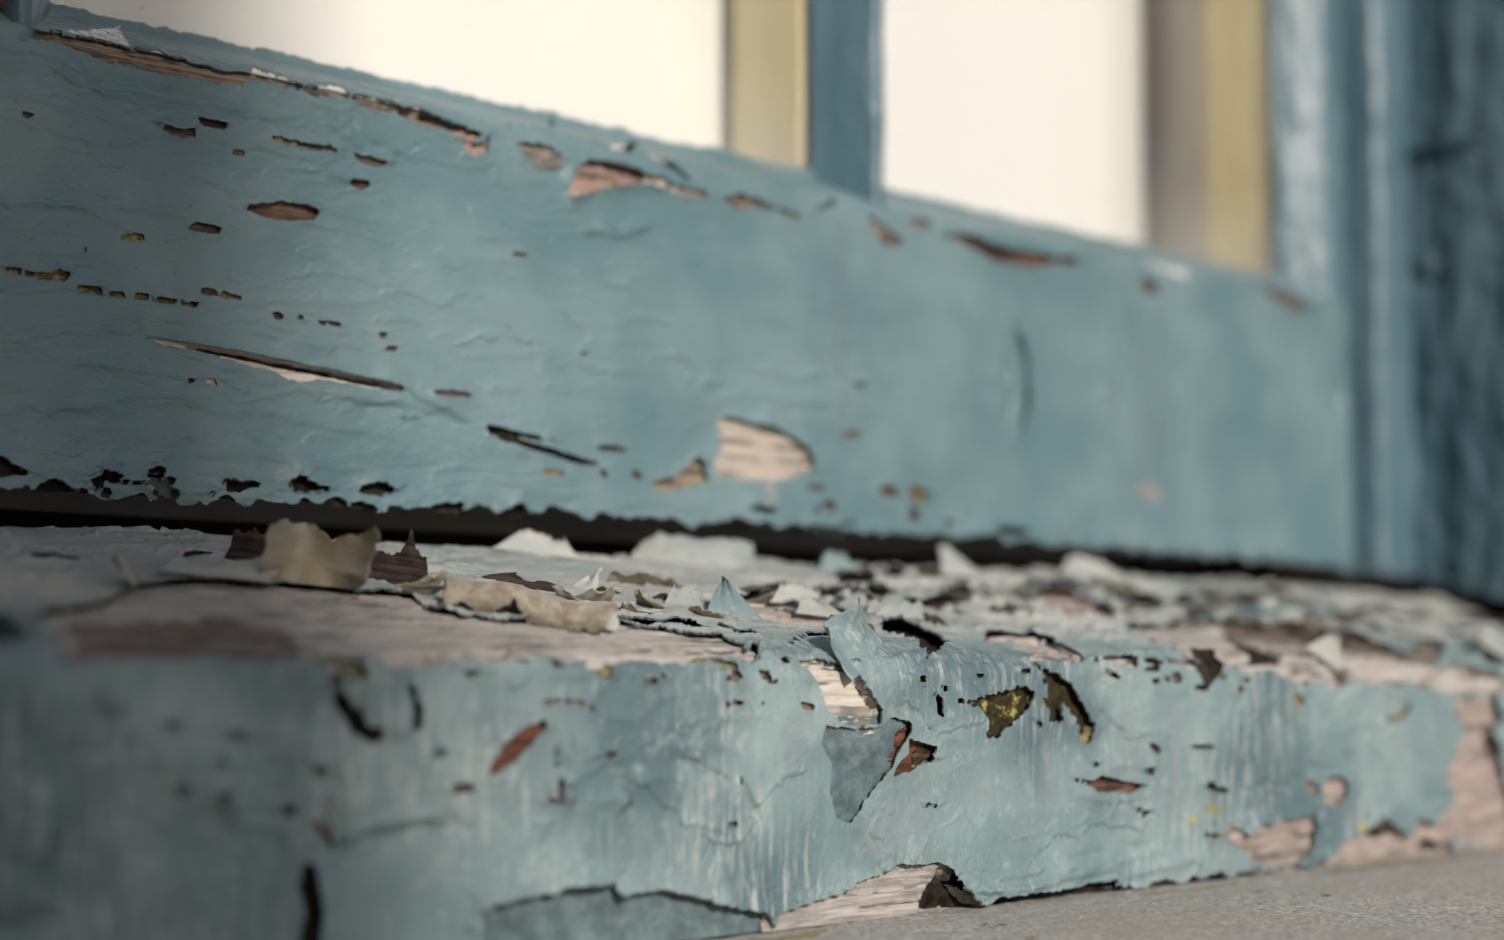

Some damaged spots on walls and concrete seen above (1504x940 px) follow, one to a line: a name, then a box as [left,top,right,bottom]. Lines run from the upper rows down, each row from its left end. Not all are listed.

peeling [0,0,1095,279]
peeling [0,252,507,431]
peeling [1132,269,1165,304]
peeling [0,401,1504,874]
peeling [457,844,1179,940]